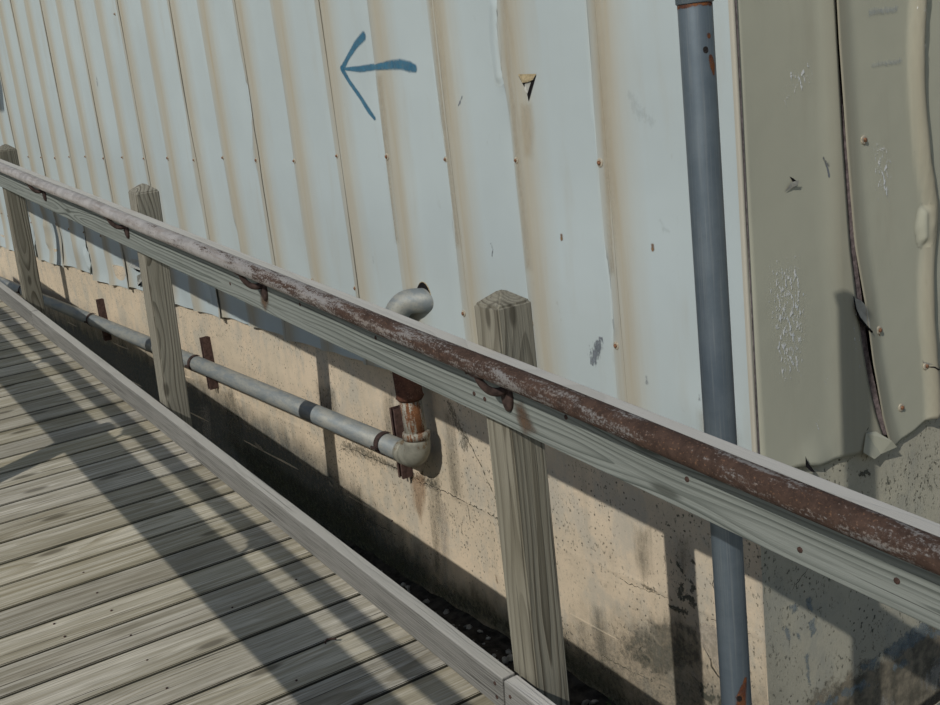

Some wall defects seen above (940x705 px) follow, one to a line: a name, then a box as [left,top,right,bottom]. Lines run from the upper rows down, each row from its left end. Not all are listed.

water stain [46,311,160,403]
water stain [187,381,427,586]
crack [339,403,498,521]
corrosion [517,406,533,431]
water stain [601,622,716,705]